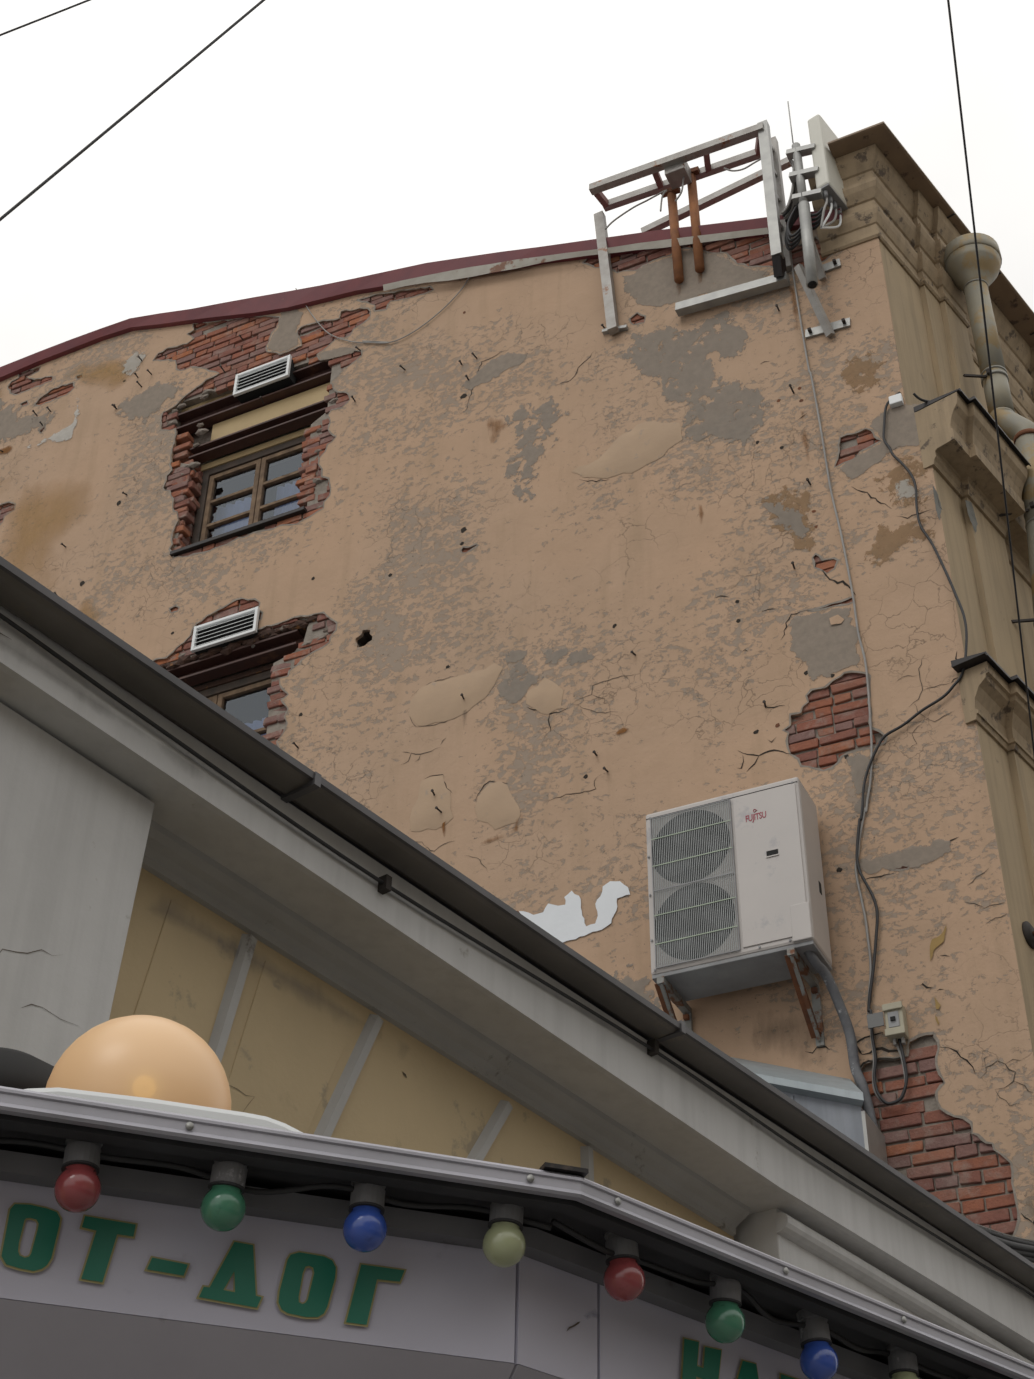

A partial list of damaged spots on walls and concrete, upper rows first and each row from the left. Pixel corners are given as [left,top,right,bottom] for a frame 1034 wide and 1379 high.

spalling [628,312,646,325]
spalling [152,285,434,558]
spalling [834,428,882,468]
spalling [0,501,16,525]
spalling [152,598,338,748]
spalling [357,632,372,647]
spalling [782,670,888,771]
spalling [854,997,1021,1236]